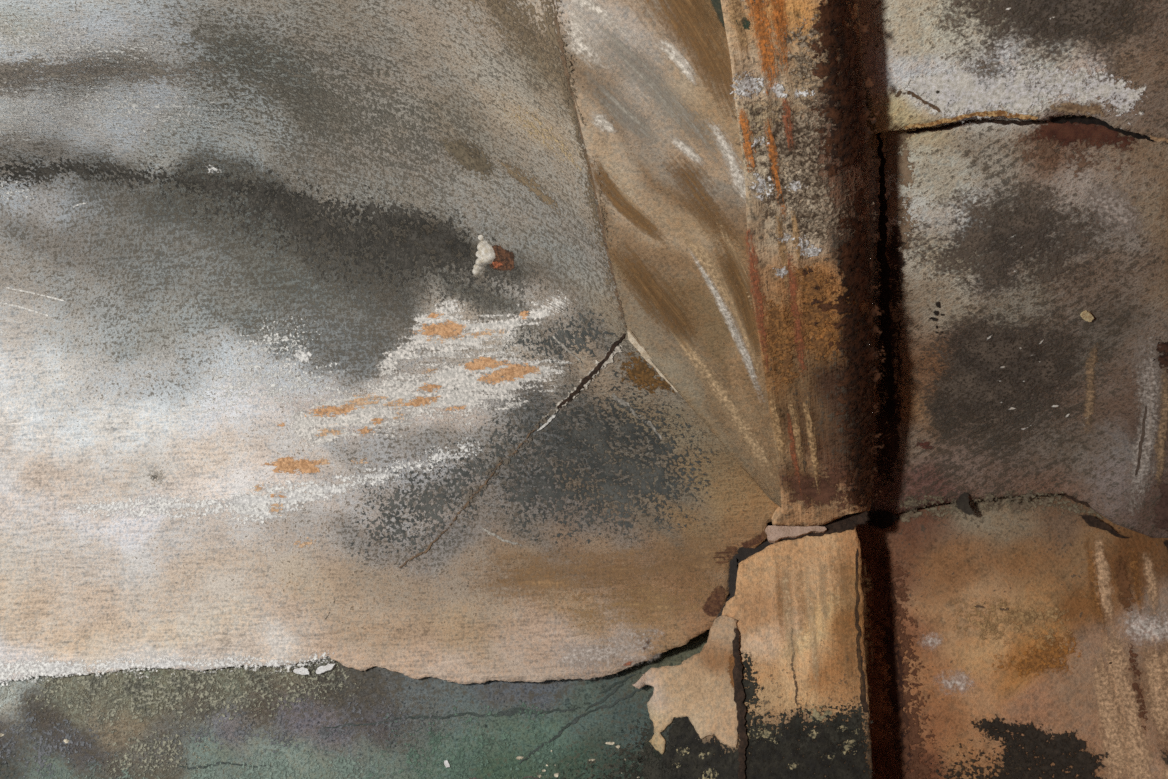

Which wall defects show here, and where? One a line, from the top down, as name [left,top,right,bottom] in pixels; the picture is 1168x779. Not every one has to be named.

leakage [0,0,567,220]
peeling [293,663,336,675]
leakage [0,154,728,671]
crack [399,0,626,568]
peeling [632,586,739,754]
leakage [565,0,885,513]
corrosion [728,0,844,388]
crack [713,511,868,779]
crack [874,91,1168,486]
leakage [904,181,1140,292]
leakage [897,0,1162,124]
crack [1064,494,1129,539]